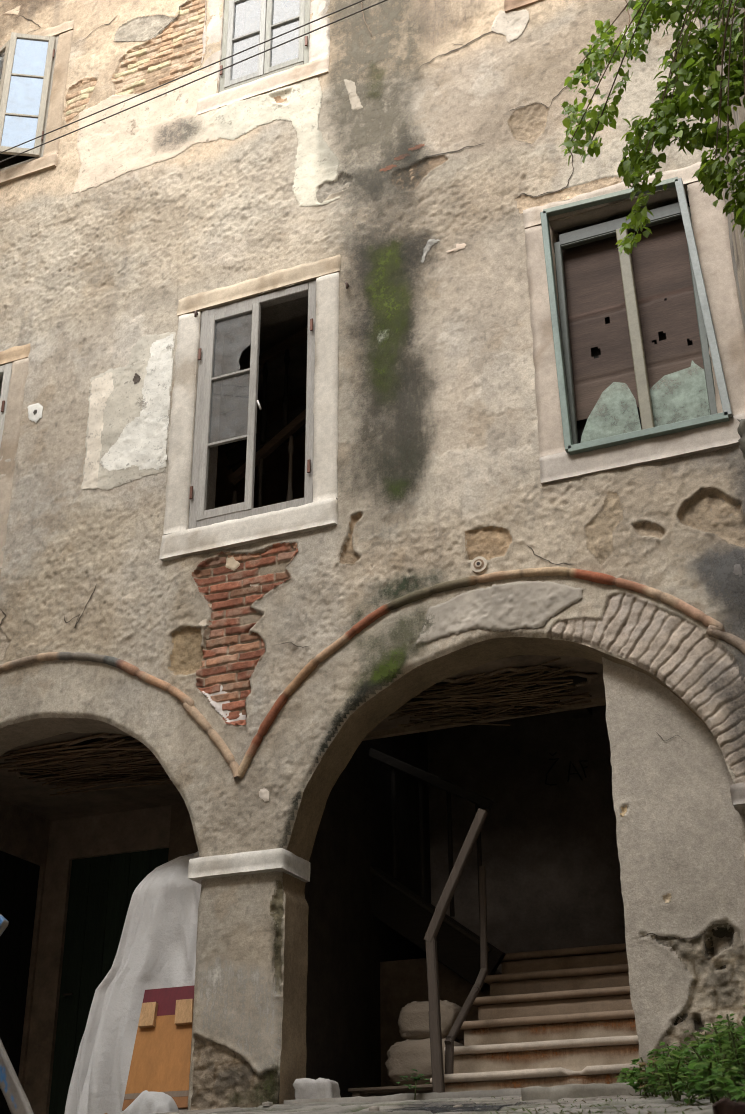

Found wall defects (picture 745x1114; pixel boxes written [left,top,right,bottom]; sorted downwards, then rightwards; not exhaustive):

peeling [63,0,353,207]
damp [326,0,467,503]
peeling [81,332,176,490]
spalling [338,511,363,565]
spalling [465,526,512,573]
spalling [585,491,666,565]
spalling [677,487,745,548]
flaking render [168,542,298,726]
flaking render [415,580,745,783]
spalling [270,880,284,994]
spalling [648,923,745,1064]
spalling [191,1034,280,1110]